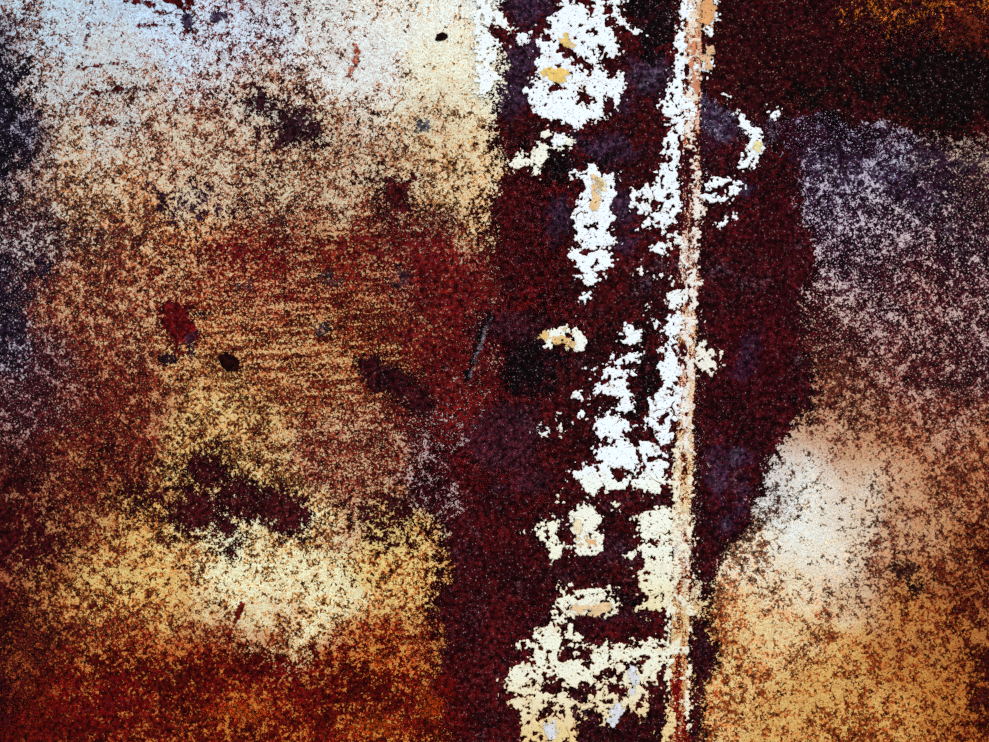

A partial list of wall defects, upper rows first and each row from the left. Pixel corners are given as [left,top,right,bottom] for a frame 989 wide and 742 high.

corrosion [0,0,686,742]
peeling [465,0,649,180]
peeling [496,0,772,742]
corrosion [679,0,989,742]